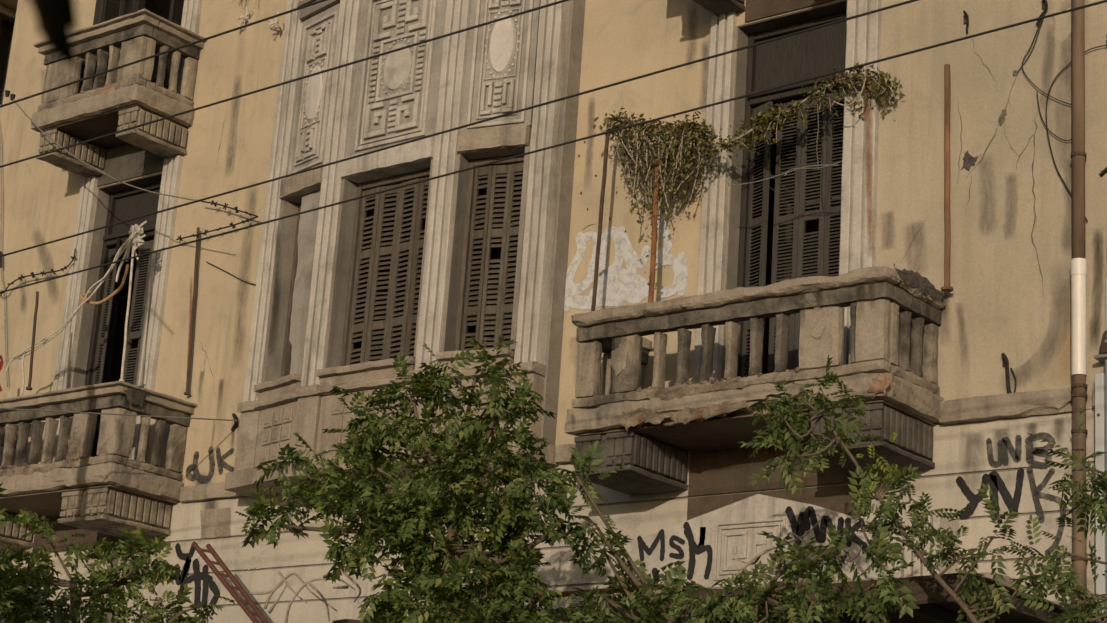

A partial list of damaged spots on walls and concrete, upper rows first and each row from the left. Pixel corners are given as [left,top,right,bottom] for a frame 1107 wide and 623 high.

crack [956,39,1044,297]
spalling [618,380,758,431]
spalling [867,373,895,399]